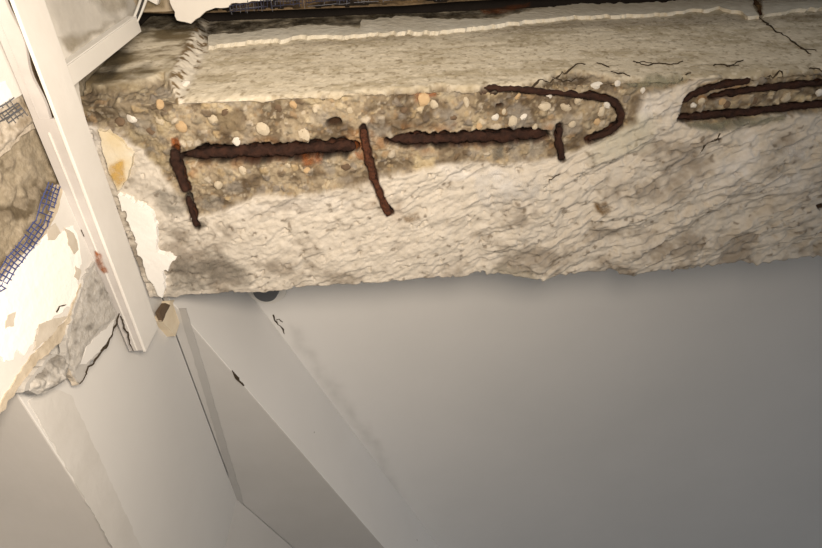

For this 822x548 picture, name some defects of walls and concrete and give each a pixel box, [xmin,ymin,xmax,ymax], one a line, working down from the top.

crack [753,0,822,72]
peeling [0,80,13,105]
crack [532,61,691,87]
spalling [80,70,822,216]
peeling [0,223,117,413]
crack [79,313,134,384]